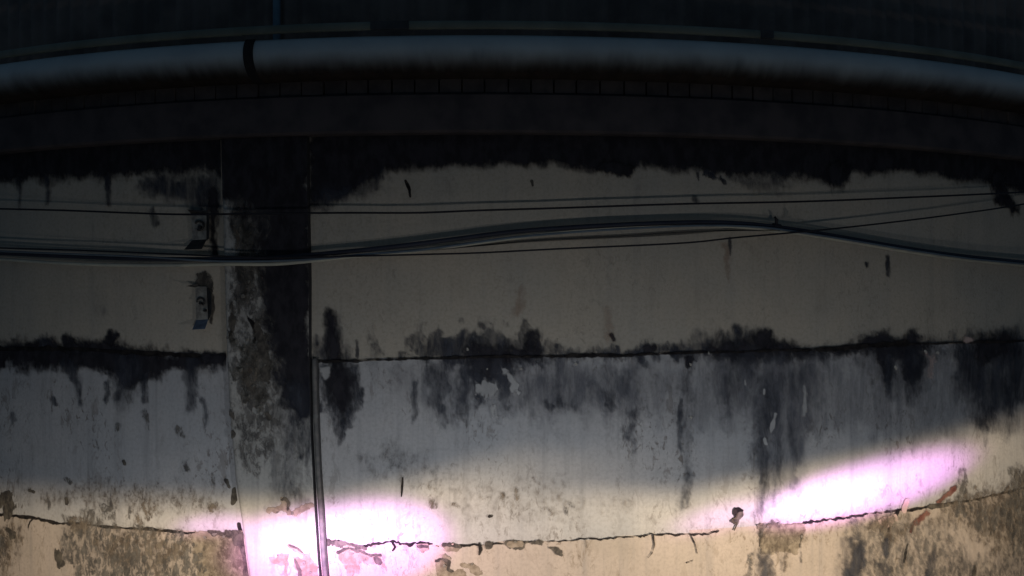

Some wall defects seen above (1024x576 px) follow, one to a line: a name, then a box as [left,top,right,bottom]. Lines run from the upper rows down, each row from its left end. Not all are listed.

leakage [0,135,1024,458]
crack [318,340,1024,363]
leakage [593,325,931,483]
crack [0,490,195,534]
spalling [188,530,248,576]
crack [326,539,433,553]
crack [459,530,719,563]
spalling [756,520,806,563]
crack [803,488,1022,562]